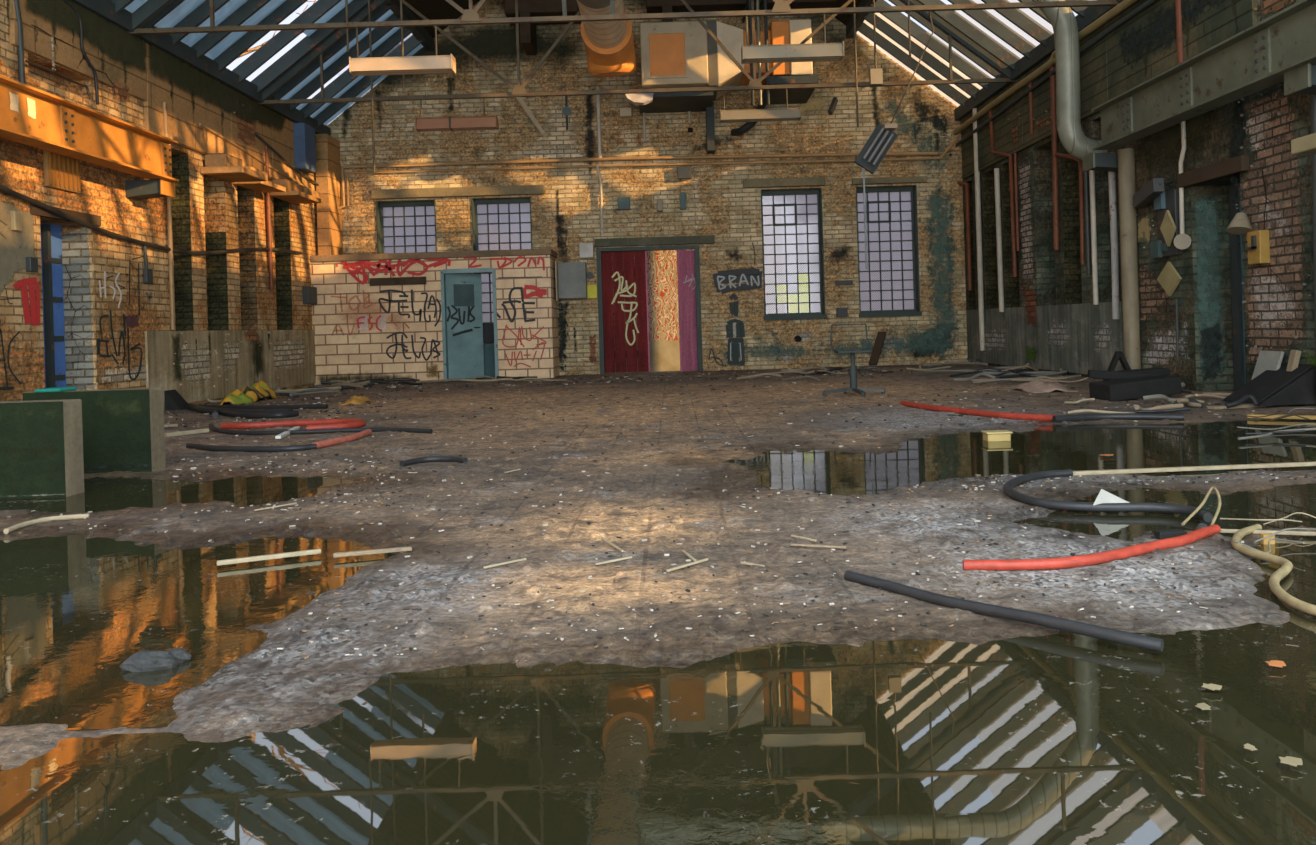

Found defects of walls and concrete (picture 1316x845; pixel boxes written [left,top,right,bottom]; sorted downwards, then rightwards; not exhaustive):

water stain [1119,0,1236,67]
water stain [1227,102,1245,158]